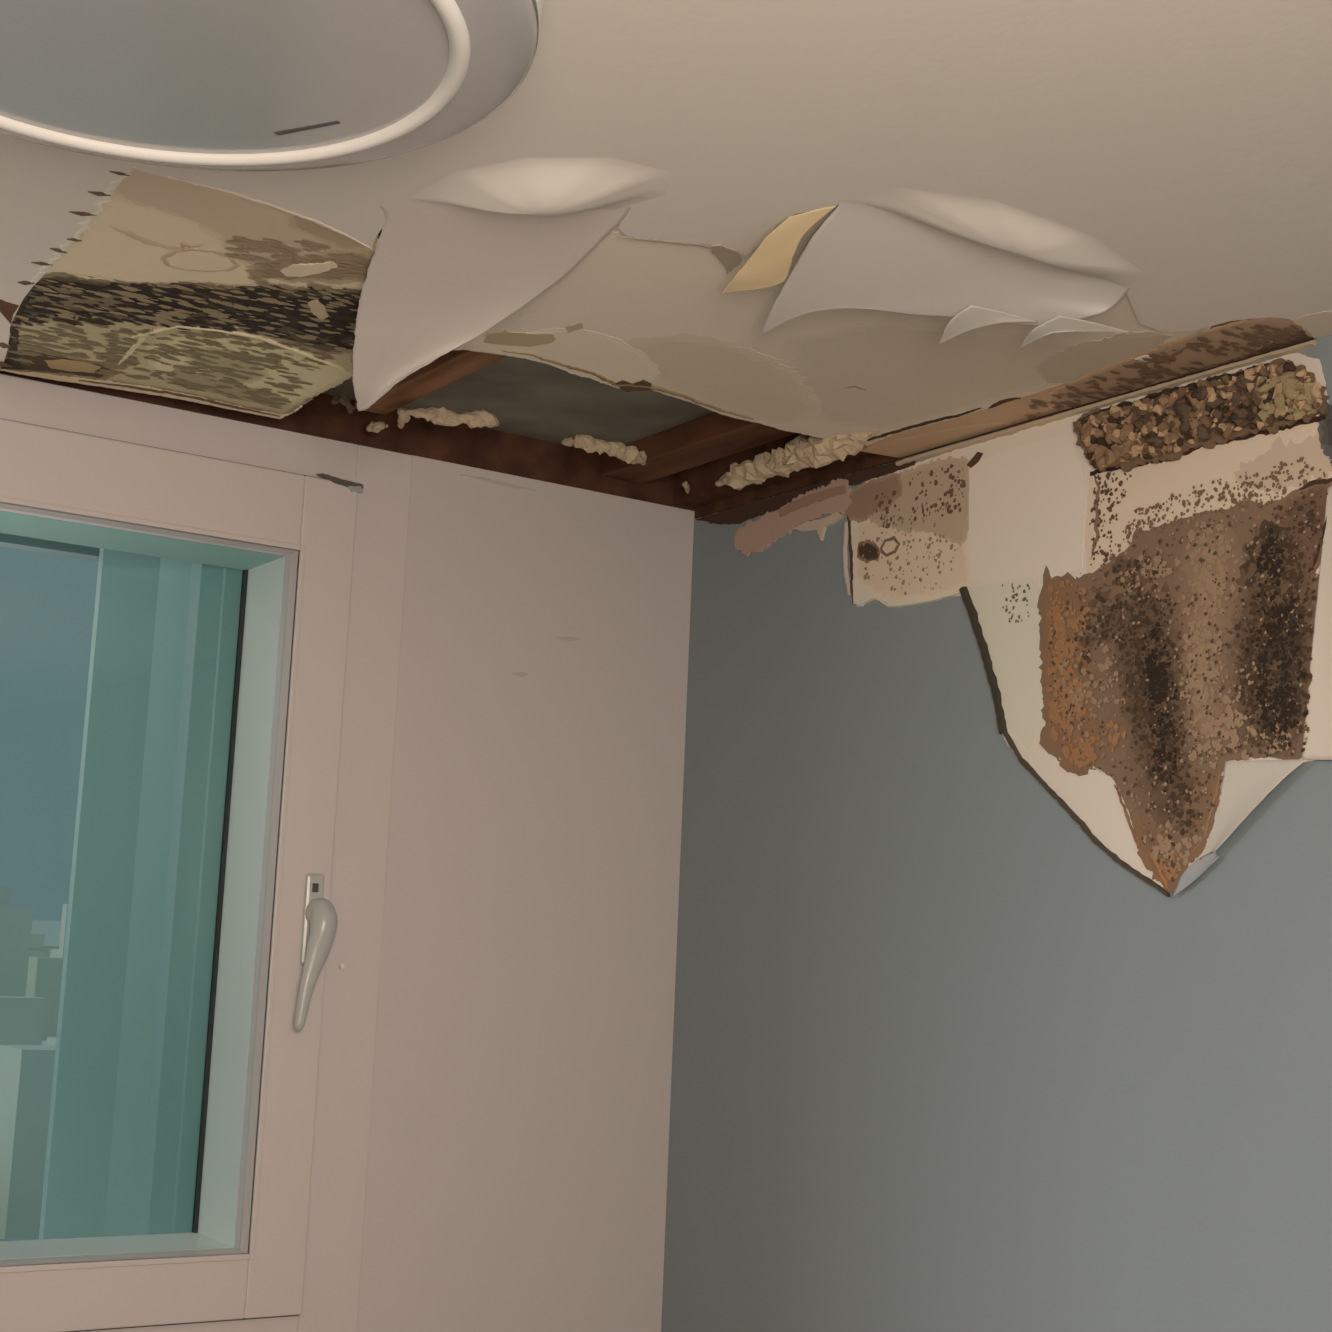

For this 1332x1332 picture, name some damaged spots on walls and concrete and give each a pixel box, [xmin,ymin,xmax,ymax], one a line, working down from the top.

leakage [0,169,376,414]
peeling [280,261,338,277]
peeling [308,299,329,321]
spalling [463,328,753,420]
leakage [778,456,969,595]
flaking render [846,520,984,607]
flaking render [865,353,1329,579]
flaking render [1002,734,1163,888]